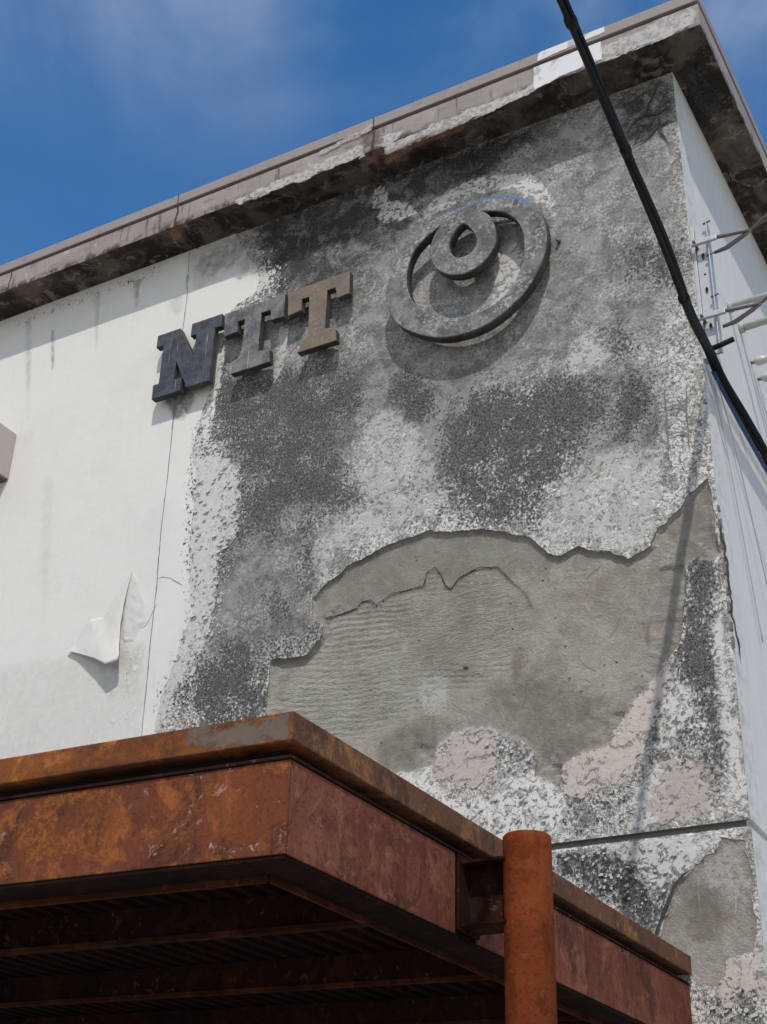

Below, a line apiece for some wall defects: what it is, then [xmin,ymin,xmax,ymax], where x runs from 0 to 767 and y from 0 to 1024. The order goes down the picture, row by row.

leakage [206,122,556,296]
peeling [235,84,536,204]
leakage [492,242,524,306]
mould [614,233,691,300]
peeling [68,572,148,665]
crack [140,397,183,736]
leakage [149,313,672,732]
flaking render [265,478,741,833]
rust [14,790,117,863]
flaking render [581,838,767,1024]